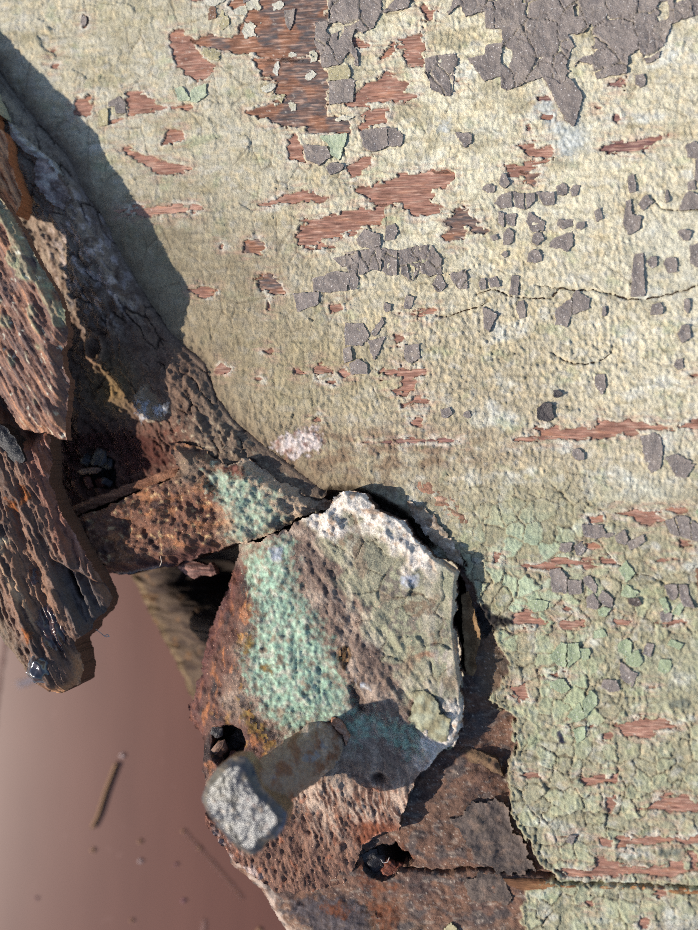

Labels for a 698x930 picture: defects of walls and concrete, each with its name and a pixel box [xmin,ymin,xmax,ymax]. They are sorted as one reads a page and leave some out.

peeling [380,0,698,127]
peeling [600,134,669,154]
peeling [622,174,654,235]
peeling [677,229,698,268]
peeling [679,141,698,211]
crack [446,285,698,317]
peeling [294,295,437,408]
peeling [513,390,698,478]
rust [64,429,333,575]
peeling [511,507,698,639]
peeling [449,797,536,906]
peeling [555,832,698,899]